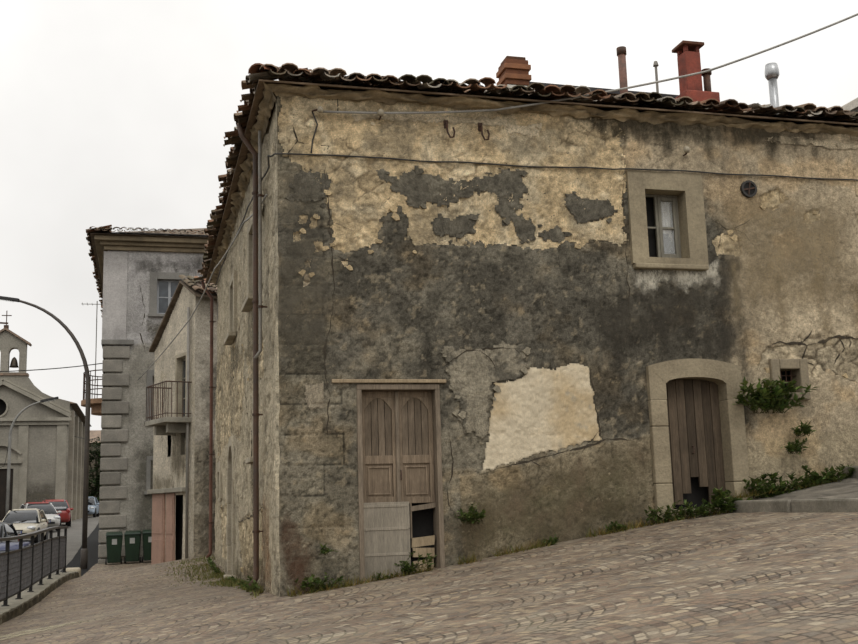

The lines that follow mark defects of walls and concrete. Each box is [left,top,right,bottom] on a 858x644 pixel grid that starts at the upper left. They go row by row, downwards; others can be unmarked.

flaking render [278,95,627,287]
flaking render [712,229,742,257]
flaking render [441,341,531,439]
crack [767,329,858,368]